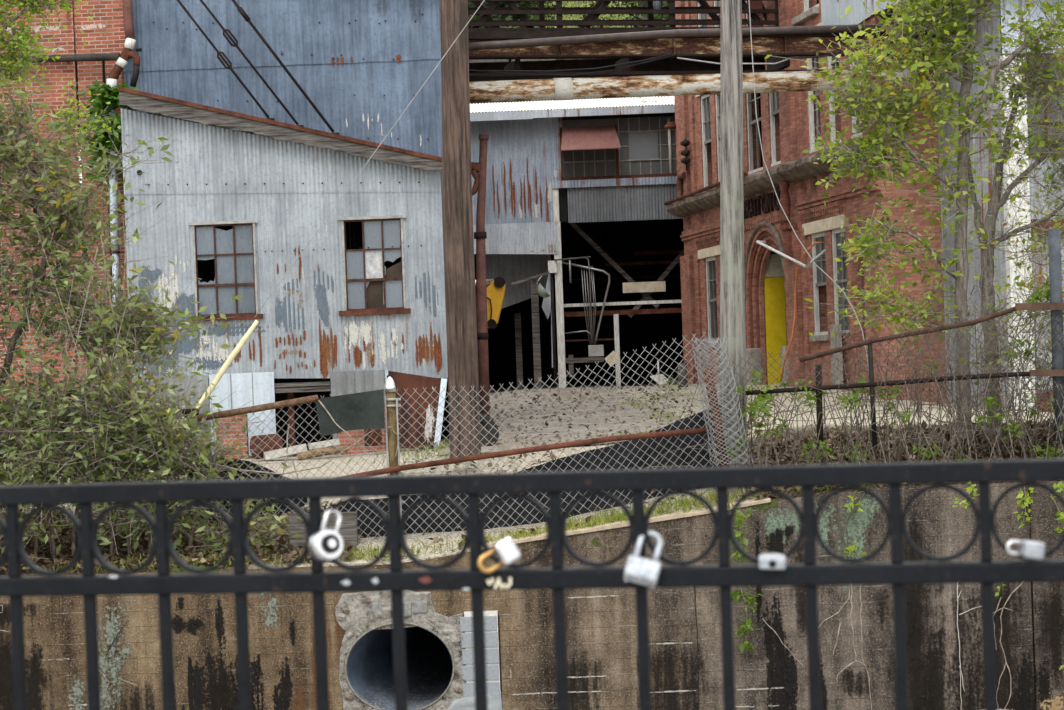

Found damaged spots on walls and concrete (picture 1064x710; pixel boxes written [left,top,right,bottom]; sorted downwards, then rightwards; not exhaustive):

corrosion [492,157,549,220]
corrosion [277,245,301,308]
corrosion [217,319,375,379]
corrosion [391,322,442,375]
damp [755,517,805,564]
damp [23,604,45,710]
damp [172,596,293,710]
spalling [335,576,465,710]
damp [546,652,605,710]
damp [637,641,708,710]
damp [756,586,807,710]
damp [842,583,1064,710]